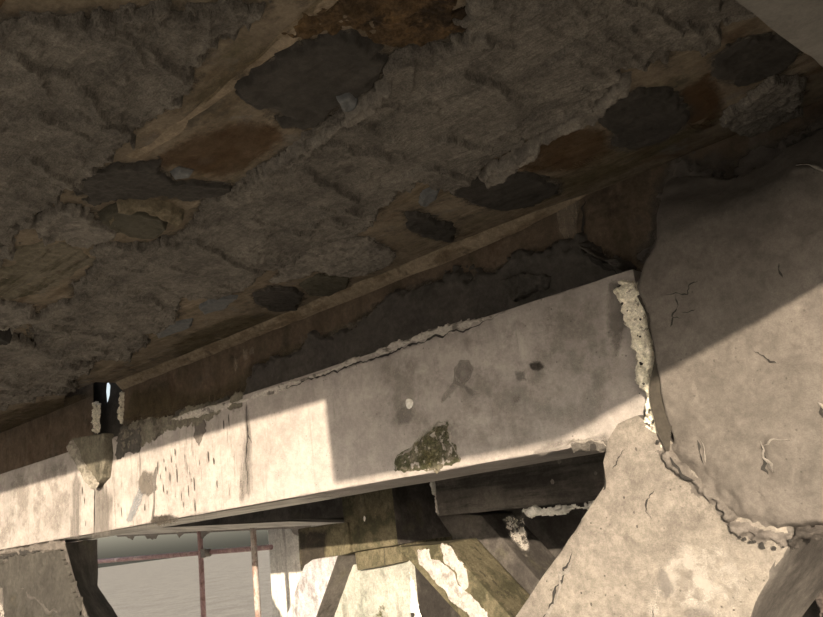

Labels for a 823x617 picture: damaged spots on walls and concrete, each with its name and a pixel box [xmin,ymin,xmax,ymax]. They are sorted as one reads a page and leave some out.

spalling [579,245,662,452]
spalling [91,401,101,434]
peeling [115,315,496,460]
spalling [394,420,461,514]
crack [670,439,706,481]
crack [760,441,773,474]
peeling [522,501,594,518]
peeling [417,543,488,617]
crack [543,549,579,617]